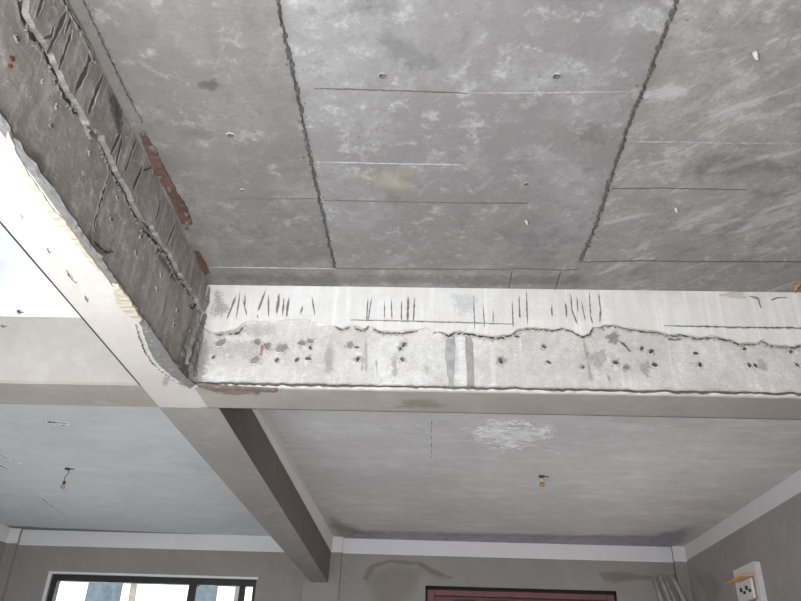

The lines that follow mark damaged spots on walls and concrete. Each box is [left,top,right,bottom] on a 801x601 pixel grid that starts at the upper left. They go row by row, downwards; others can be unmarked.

crack [13,0,79,119]
spalling [44,10,73,70]
spalling [74,50,104,115]
crack [60,0,143,123]
crack [66,270,88,302]
crack [91,142,196,314]
corrosion [195,251,209,275]
spalling [0,110,801,399]
crack [334,284,801,352]